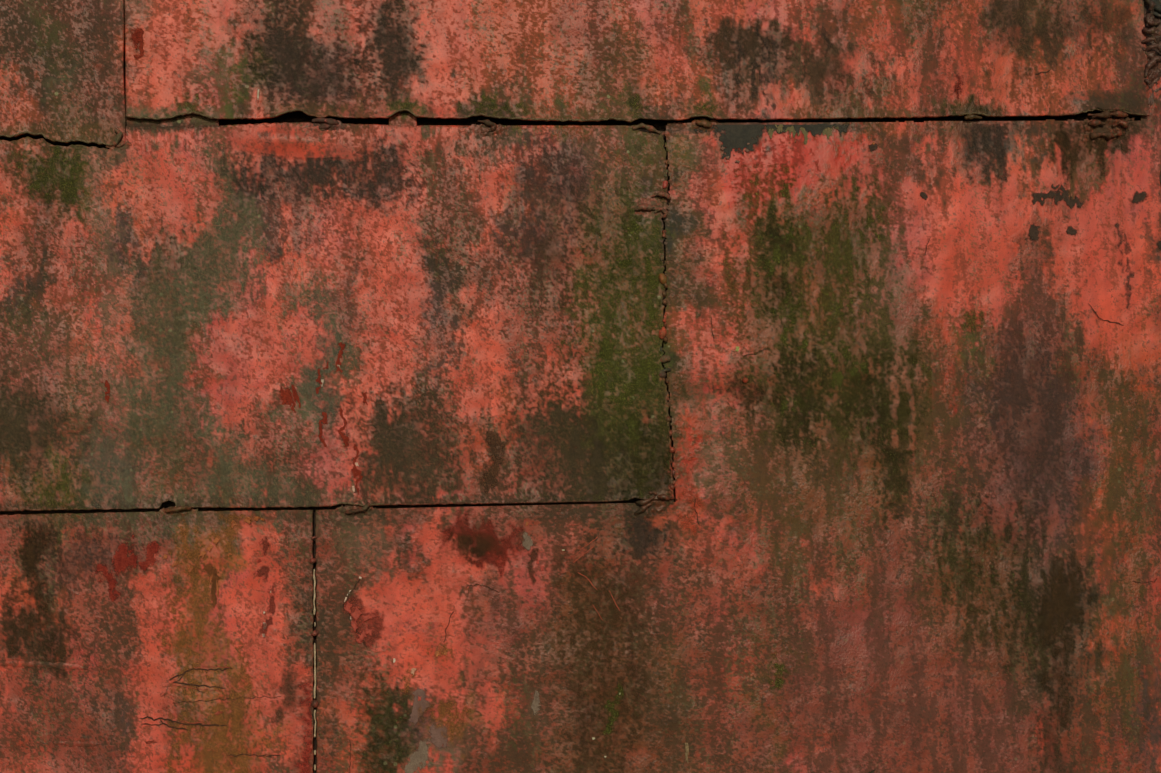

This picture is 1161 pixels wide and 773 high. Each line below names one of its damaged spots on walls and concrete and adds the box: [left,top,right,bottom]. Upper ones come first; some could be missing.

corrosion [131,28,144,60]
peeling [1032,184,1083,209]
corrosion [280,384,301,413]
corrosion [319,408,363,495]
damp [512,384,616,501]
corrosion [96,535,159,602]
peeling [163,561,221,693]
peeling [253,537,275,637]
peeling [344,590,383,646]
corrosion [443,513,523,576]
peeling [404,668,469,773]